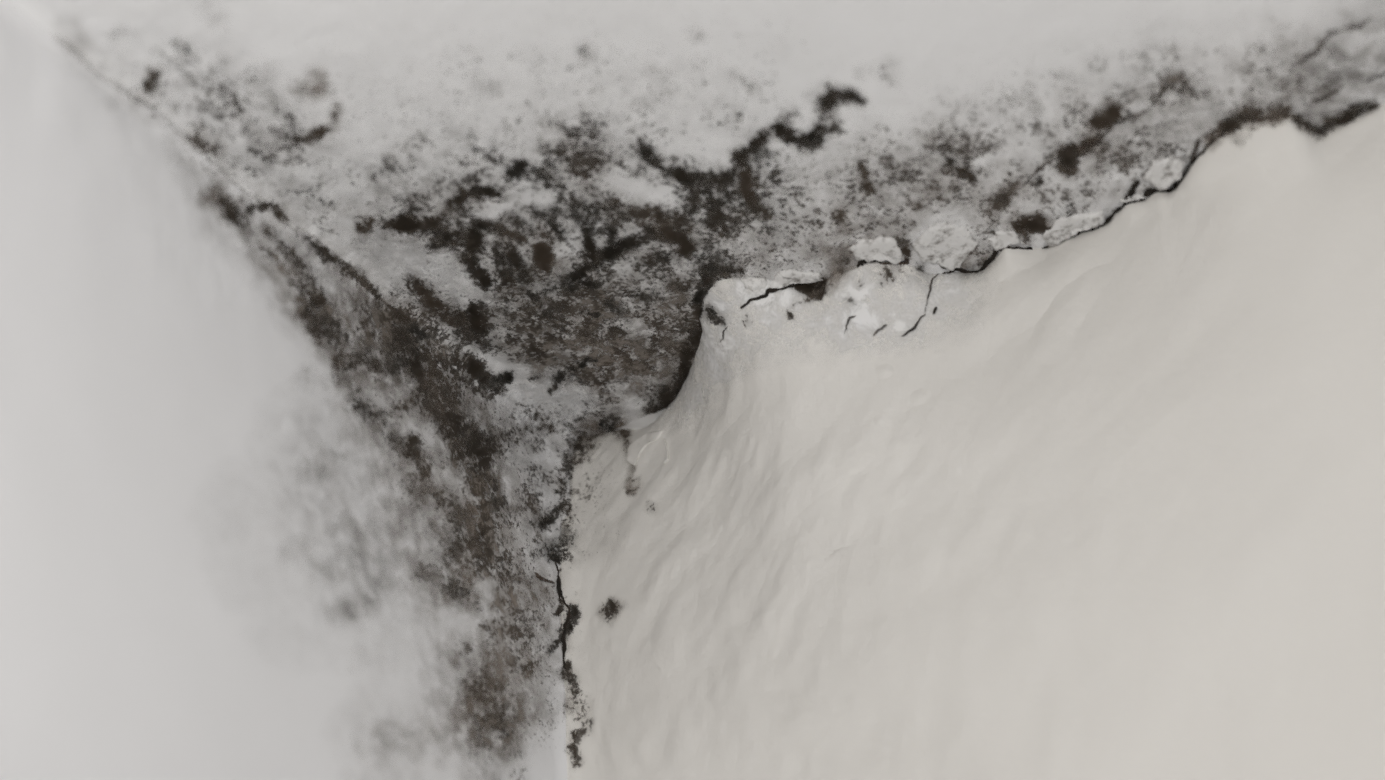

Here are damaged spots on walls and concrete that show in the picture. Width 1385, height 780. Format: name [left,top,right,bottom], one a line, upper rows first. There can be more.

damp [128,41,340,235]
flaking render [1120,154,1186,203]
flaking render [845,221,1021,271]
flaking render [1042,209,1106,248]
crack [703,267,797,342]
peeling [740,269,825,292]
damp [249,39,1385,780]